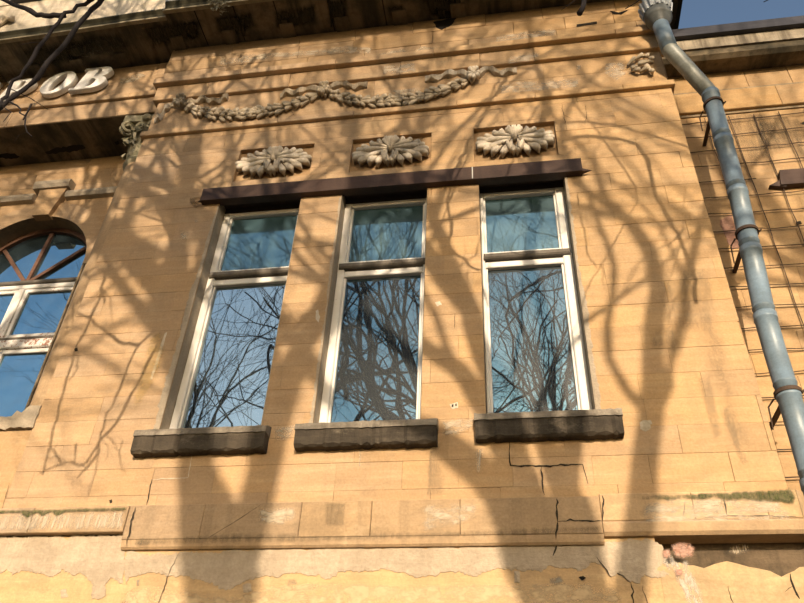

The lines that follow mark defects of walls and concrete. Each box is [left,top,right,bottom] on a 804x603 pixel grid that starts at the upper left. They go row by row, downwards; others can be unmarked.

crack [126,456,192,544]
crack [509,442,604,555]
crack [597,558,648,603]
spalling [663,543,693,557]